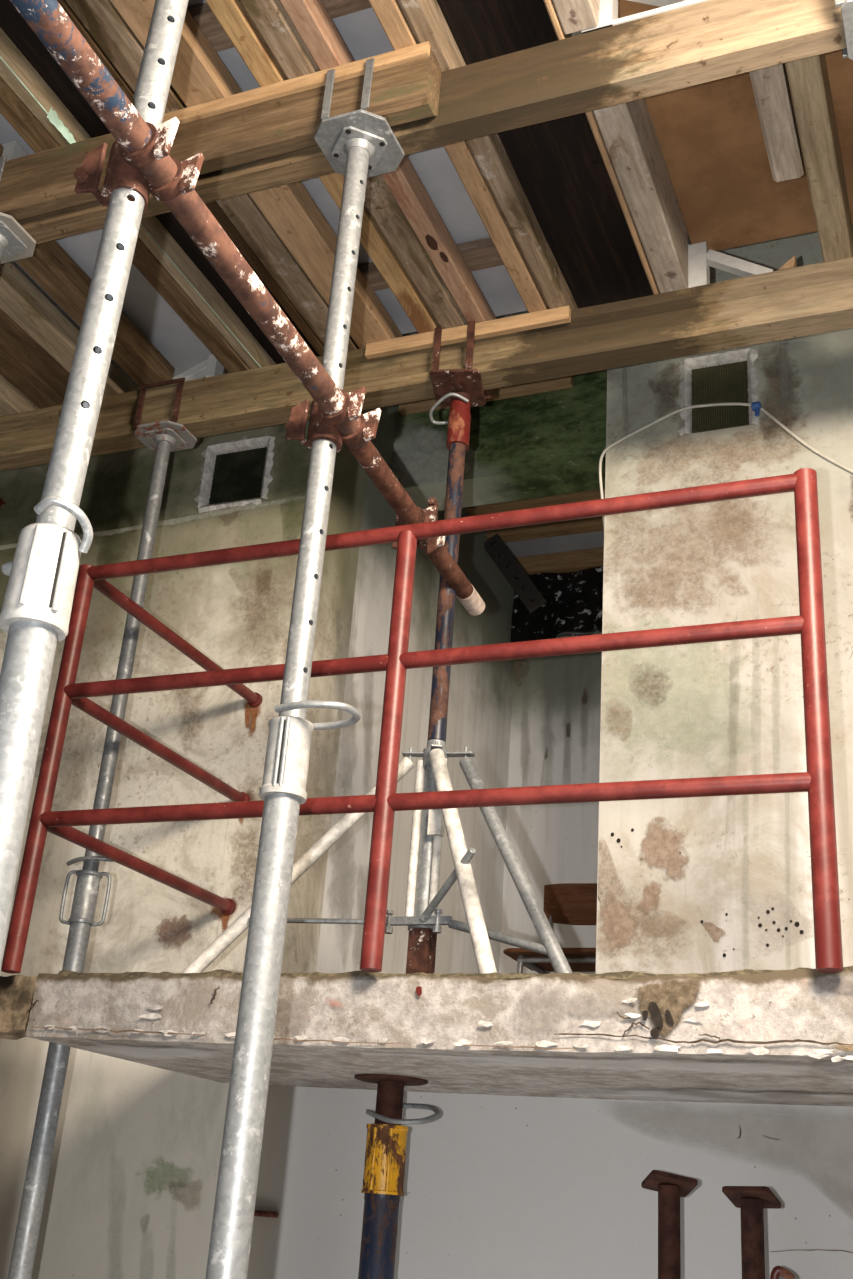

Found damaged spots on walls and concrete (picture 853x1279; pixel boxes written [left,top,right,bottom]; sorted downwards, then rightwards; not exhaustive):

crack [30,999,235,1037]
peeling [130,1005,205,1036]
crack [274,1037,408,1045]
spalling [519,978,710,1052]
crack [463,1012,853,1050]
peeling [747,1047,769,1055]
water stain [437,1056,853,1199]